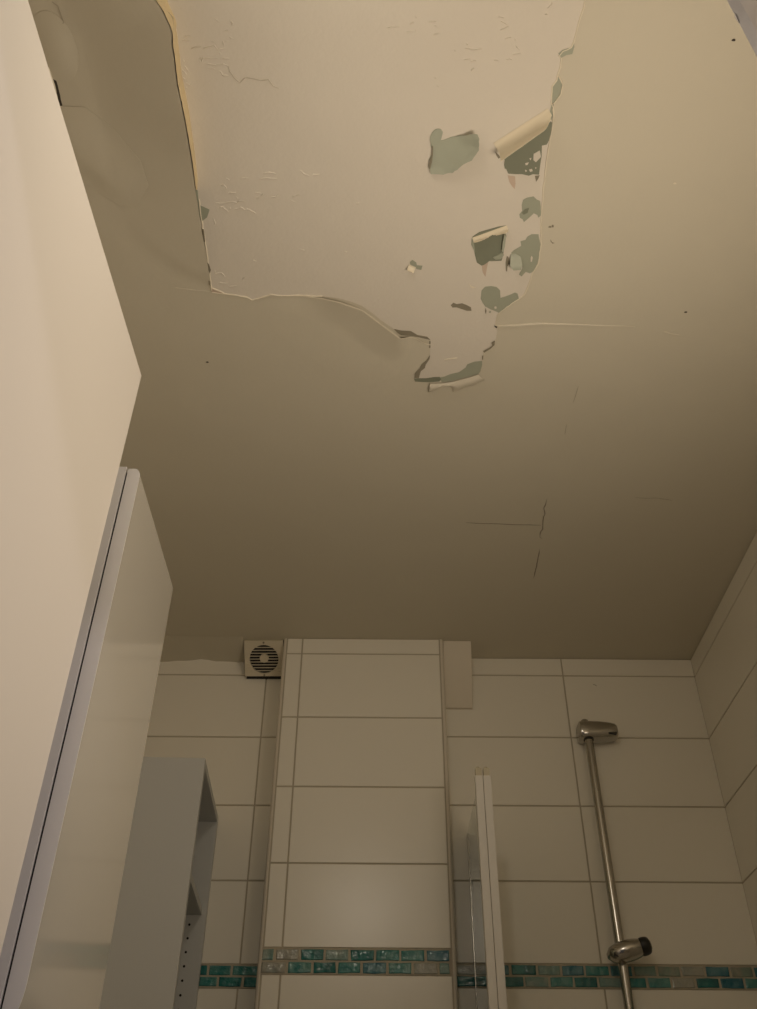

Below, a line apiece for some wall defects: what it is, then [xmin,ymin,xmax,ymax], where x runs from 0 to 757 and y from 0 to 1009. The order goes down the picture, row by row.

flaking render [34,0,584,382]